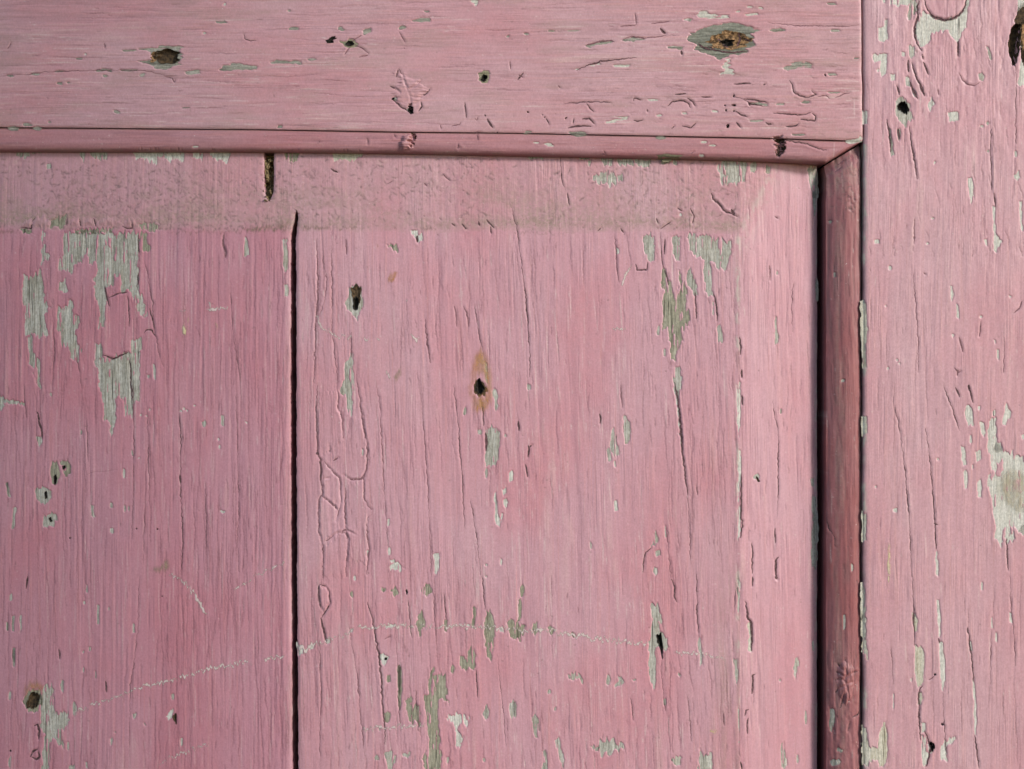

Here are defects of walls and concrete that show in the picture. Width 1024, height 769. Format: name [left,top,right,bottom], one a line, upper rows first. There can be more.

peeling [883,0,969,58]
peeling [20,214,162,397]
peeling [94,337,156,436]
peeling [643,232,731,445]
spalling [35,460,71,527]
crack [314,236,446,761]
crack [643,382,699,629]
peeling [961,404,1024,547]
peeling [9,680,77,769]
peeling [374,585,554,769]
spalling [648,603,668,689]
peeling [861,722,888,767]